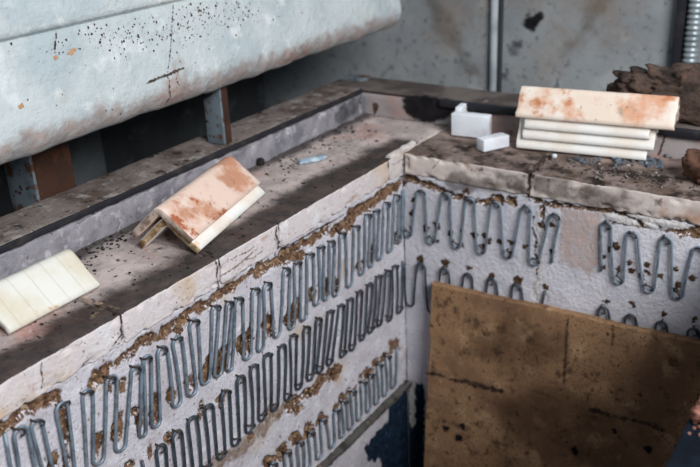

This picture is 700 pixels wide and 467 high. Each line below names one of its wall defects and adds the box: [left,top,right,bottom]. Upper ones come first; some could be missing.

crack [148,5,184,104]
crack [527,157,551,303]
spalling [529,194,700,239]
crack [81,297,124,346]
spalling [87,174,517,394]
spalling [0,389,72,467]
spalling [91,387,176,459]
spalling [211,363,342,467]
spalling [262,337,400,467]
peeling [364,381,426,467]